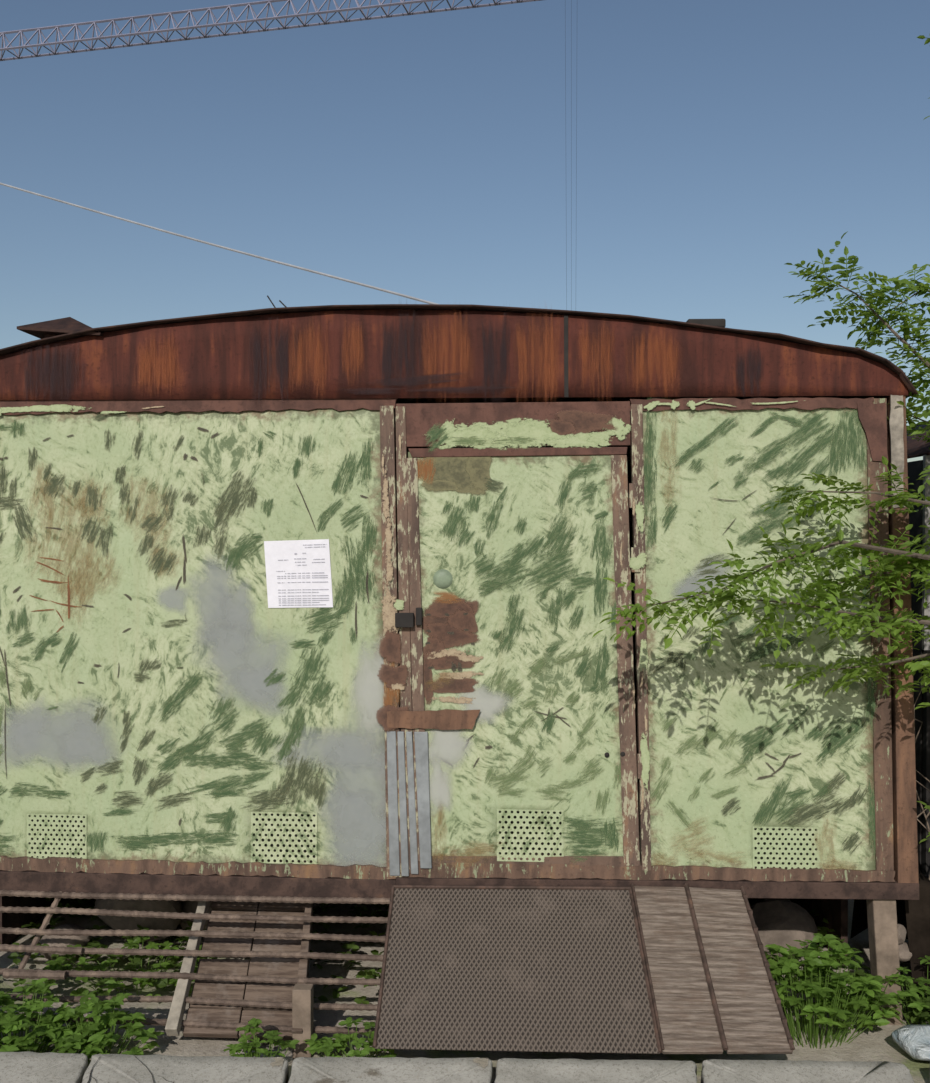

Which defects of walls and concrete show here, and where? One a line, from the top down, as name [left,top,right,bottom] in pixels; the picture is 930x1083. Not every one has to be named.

peeling [28,437,113,555]
peeling [132,430,143,459]
peeling [726,400,867,546]
peeling [81,436,393,852]
peeling [419,397,737,861]
peeling [0,782,70,799]
peeling [633,612,877,827]
peeling [753,772,876,855]